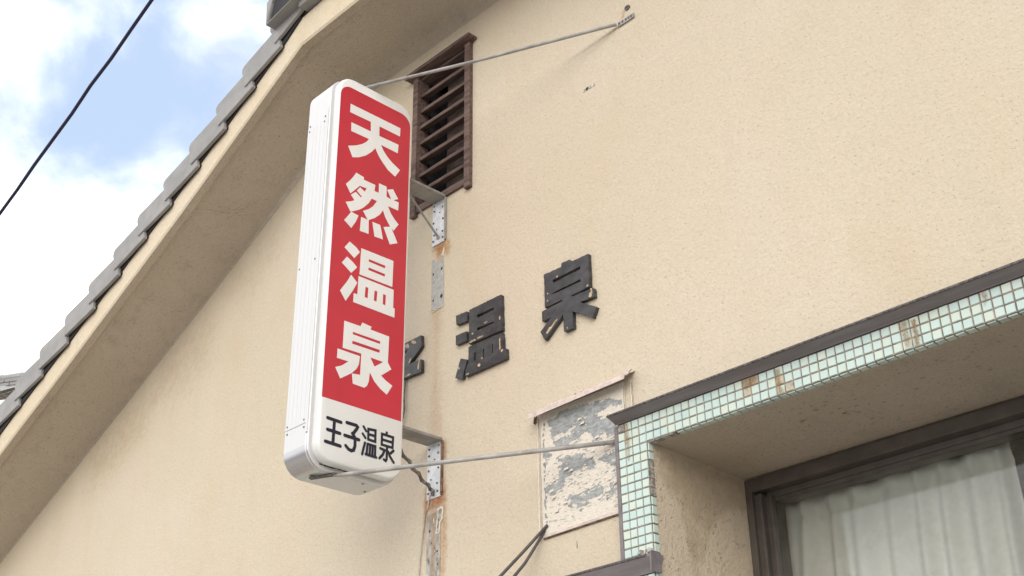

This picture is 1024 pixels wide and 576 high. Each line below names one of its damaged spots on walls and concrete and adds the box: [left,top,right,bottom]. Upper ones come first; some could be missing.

peeling [542,398,625,531]